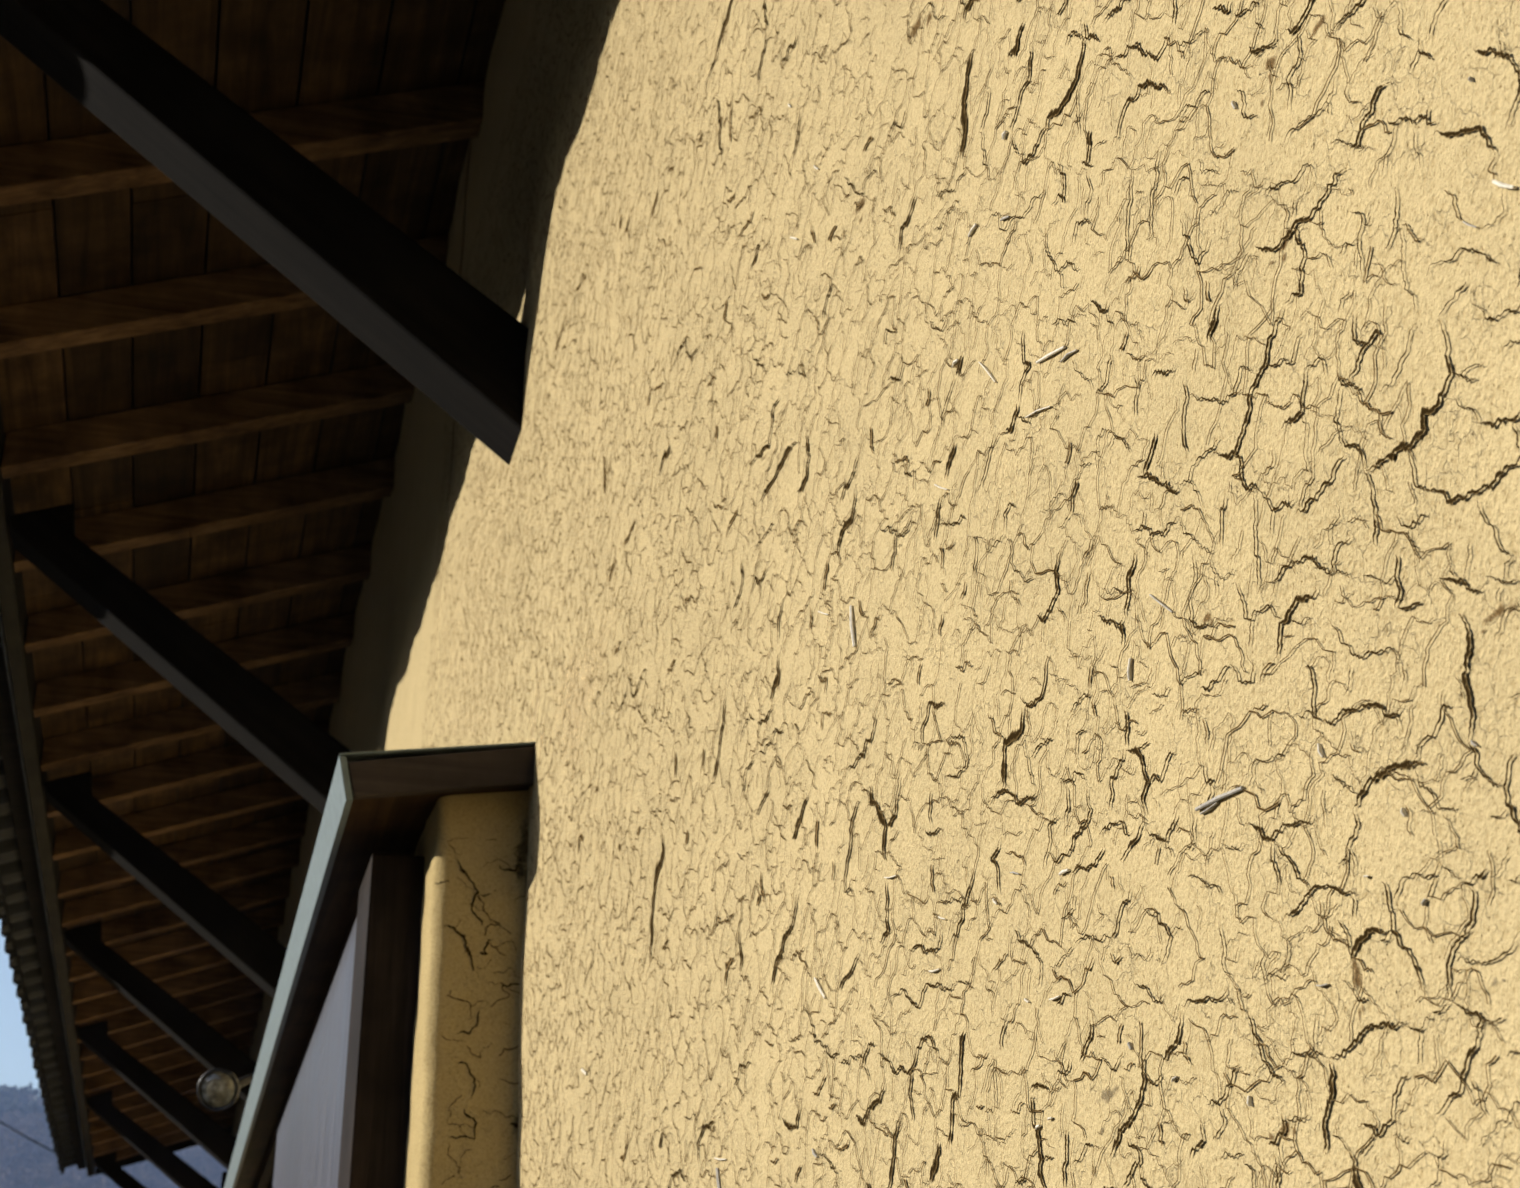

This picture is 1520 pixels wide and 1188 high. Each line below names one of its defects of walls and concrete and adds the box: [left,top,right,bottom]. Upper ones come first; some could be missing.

crack [422,0,1520,1188]